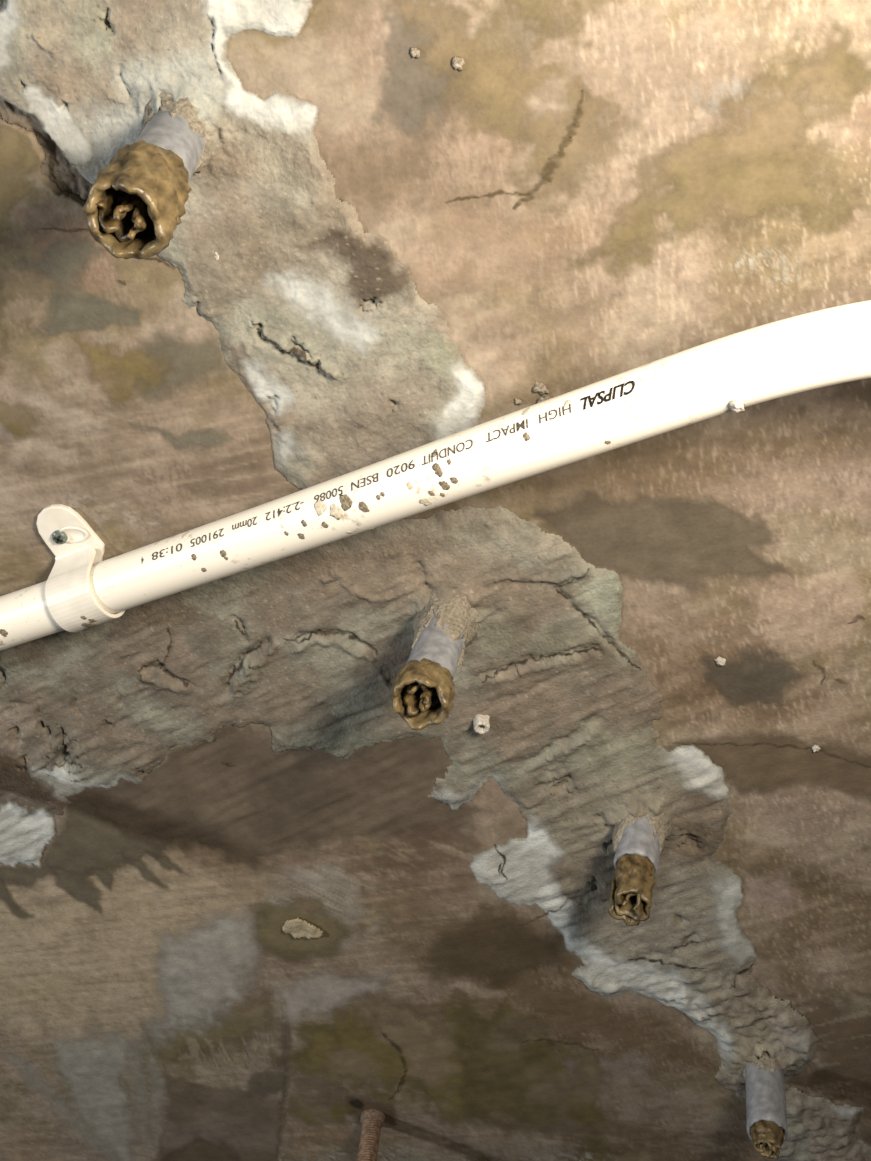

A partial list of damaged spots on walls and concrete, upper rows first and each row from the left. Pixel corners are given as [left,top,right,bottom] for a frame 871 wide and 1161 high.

spalling [0,0,486,490]
damp [398,0,625,204]
damp [600,28,871,271]
damp [735,252,797,284]
damp [56,1037,141,1161]
damp [127,854,182,888]
peeling [156,1027,290,1161]
peeling [282,917,323,939]
damp [144,865,672,1161]
damp [470,823,733,1060]